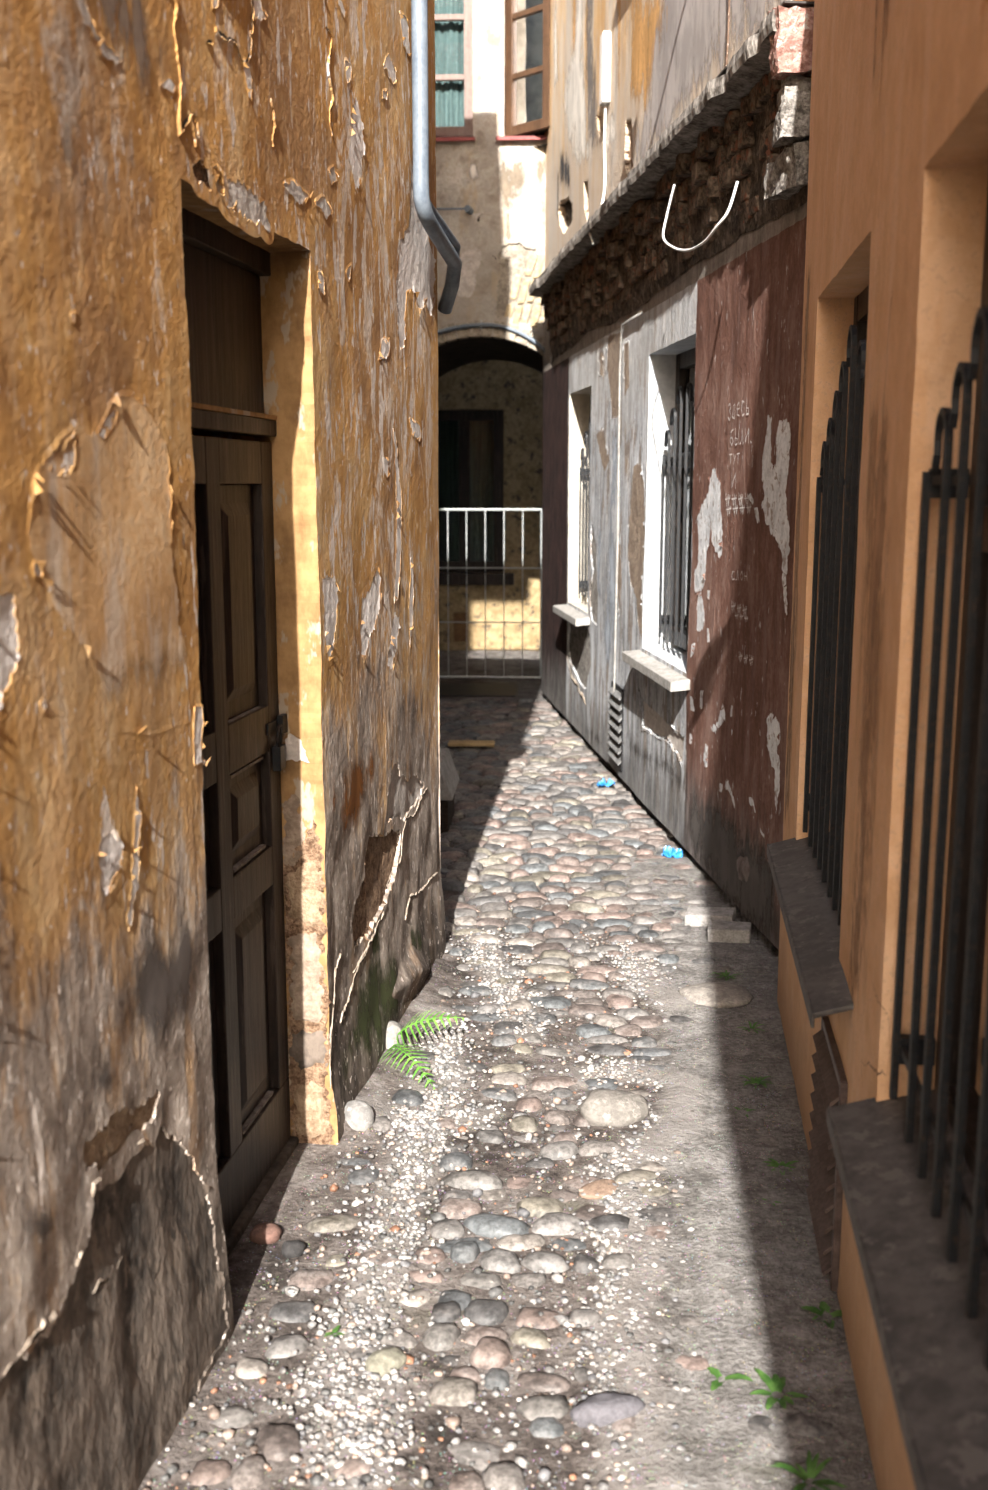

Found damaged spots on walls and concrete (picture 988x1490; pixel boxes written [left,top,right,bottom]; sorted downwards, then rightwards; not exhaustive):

peeling [188,145,274,245]
peeling [378,156,437,362]
spalling [457,0,814,658]
peeling [0,390,210,766]
peeling [319,565,340,668]
spalling [567,517,599,695]
water stain [598,437,617,660]
peeling [92,787,142,930]
water stain [137,925,192,1036]
crack [329,788,437,1088]
water stain [630,743,680,784]
spalling [0,1077,232,1490]